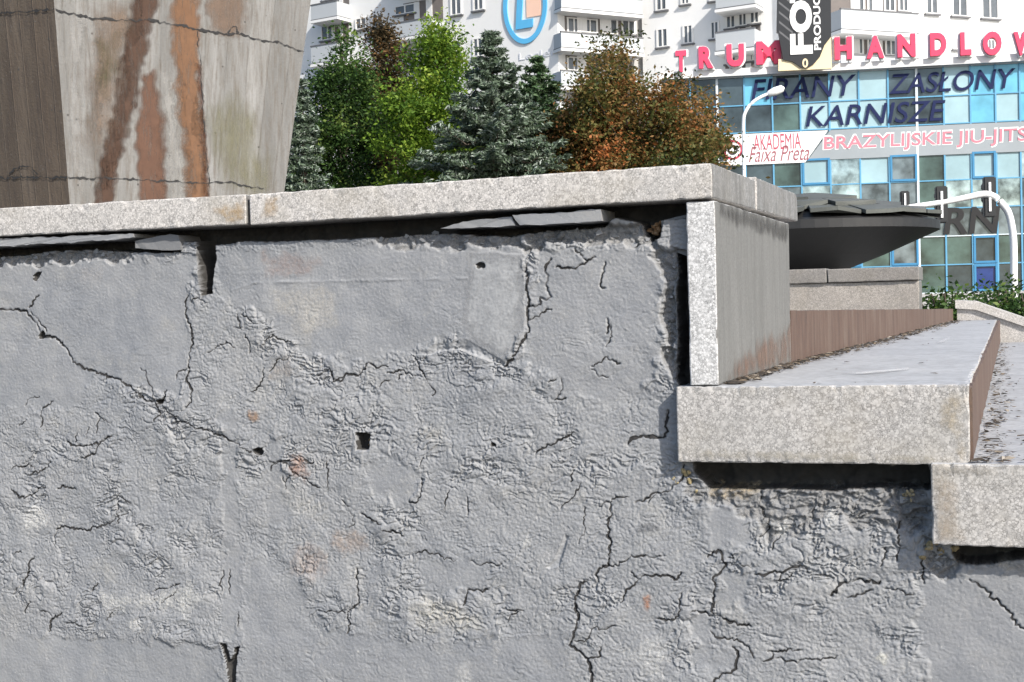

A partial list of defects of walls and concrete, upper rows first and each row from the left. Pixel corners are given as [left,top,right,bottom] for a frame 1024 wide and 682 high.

crack [0,8,302,195]
rust [91,0,242,203]
spalling [379,209,687,373]
crack [504,249,606,367]
crack [0,295,456,562]
spalling [355,432,371,450]
spalling [738,483,932,538]
crack [15,551,81,631]
crack [325,570,360,634]
crack [561,464,925,682]
crack [969,579,1024,629]